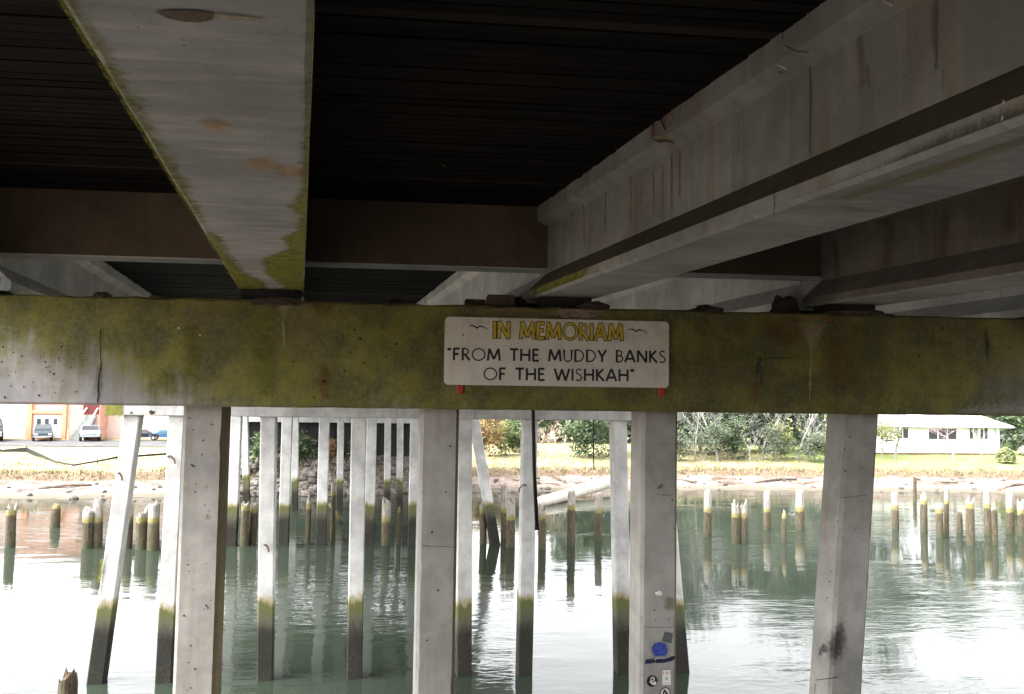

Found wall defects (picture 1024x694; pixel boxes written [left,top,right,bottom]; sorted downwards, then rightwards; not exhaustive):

spalling [156,10,258,22]
spalling [650,110,674,144]
crack [95,328,103,402]
water stain [819,625,846,660]